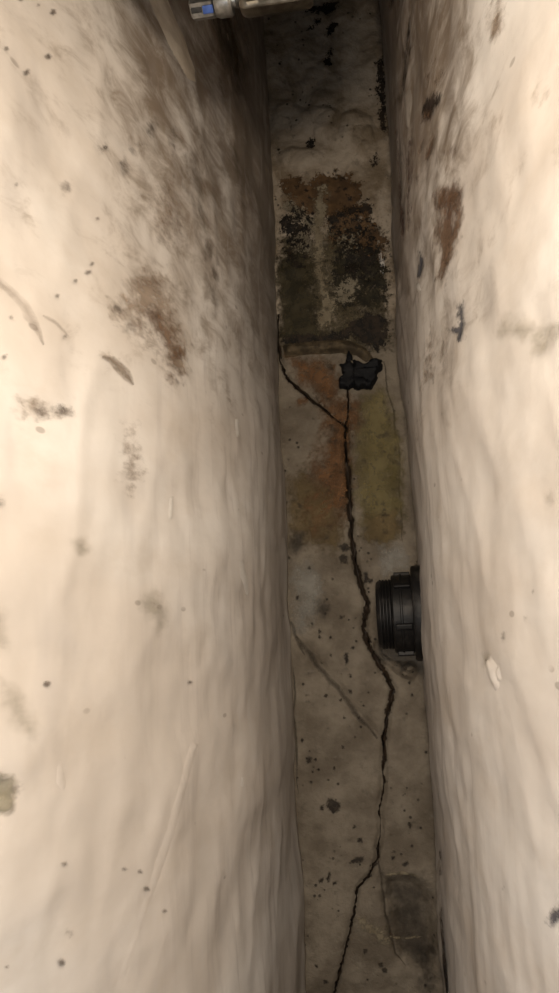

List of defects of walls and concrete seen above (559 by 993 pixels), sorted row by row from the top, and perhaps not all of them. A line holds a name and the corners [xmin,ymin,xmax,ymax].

leakage [274,184,393,353]
corrosion [292,357,358,536]
crack [277,314,404,993]